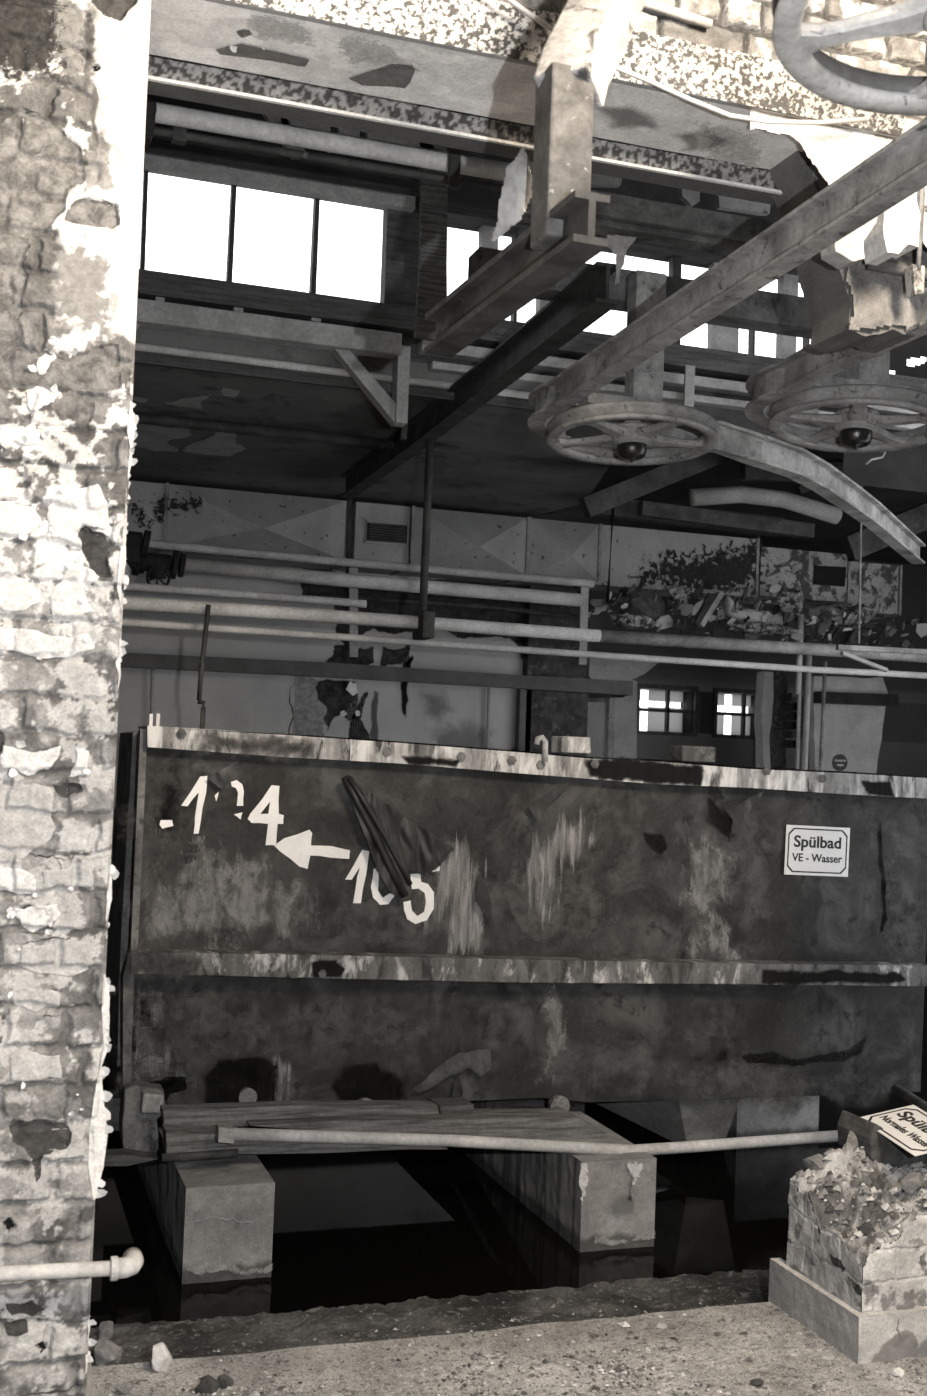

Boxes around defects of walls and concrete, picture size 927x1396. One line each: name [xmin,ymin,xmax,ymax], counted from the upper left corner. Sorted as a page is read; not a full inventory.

flaking render [91,0,137,21]
flaking render [0,108,246,660]
peeling [116,638,128,687]
rust [862,781,894,797]
rust [585,757,740,960]
rust [877,822,887,934]
peeling [0,730,119,1200]
rust [762,969,906,986]
spalling [858,1222,875,1236]
flaking render [805,1251,862,1296]
flaking render [4,1300,45,1336]
peeling [85,1316,97,1374]